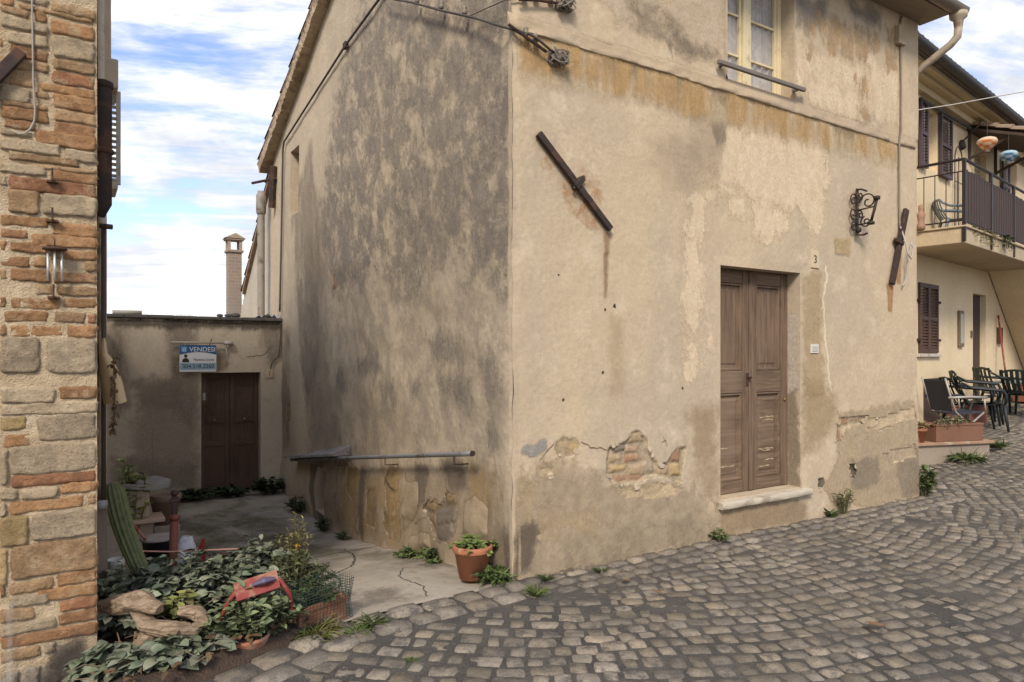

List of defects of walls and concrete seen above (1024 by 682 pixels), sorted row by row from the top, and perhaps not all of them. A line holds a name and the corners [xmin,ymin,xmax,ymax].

water stain [112,0,897,427]
spalling [536,436,581,481]
spalling [605,429,686,500]
peeling [818,399,919,508]
spalling [366,466,401,543]
spalling [421,489,460,545]